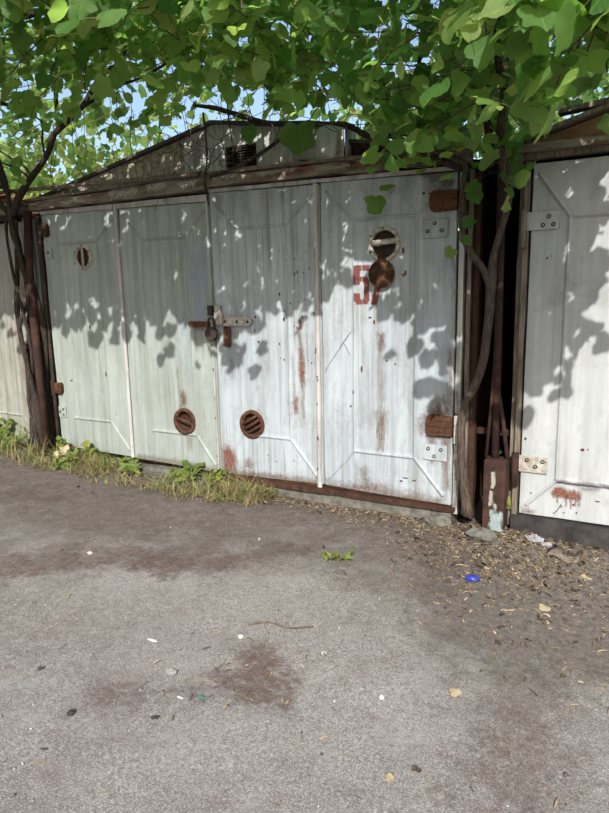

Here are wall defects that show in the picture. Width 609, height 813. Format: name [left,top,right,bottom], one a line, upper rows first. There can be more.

corrosion [223,448,317,485]
peeling [489,472,503,532]
corrosion [552,488,581,506]